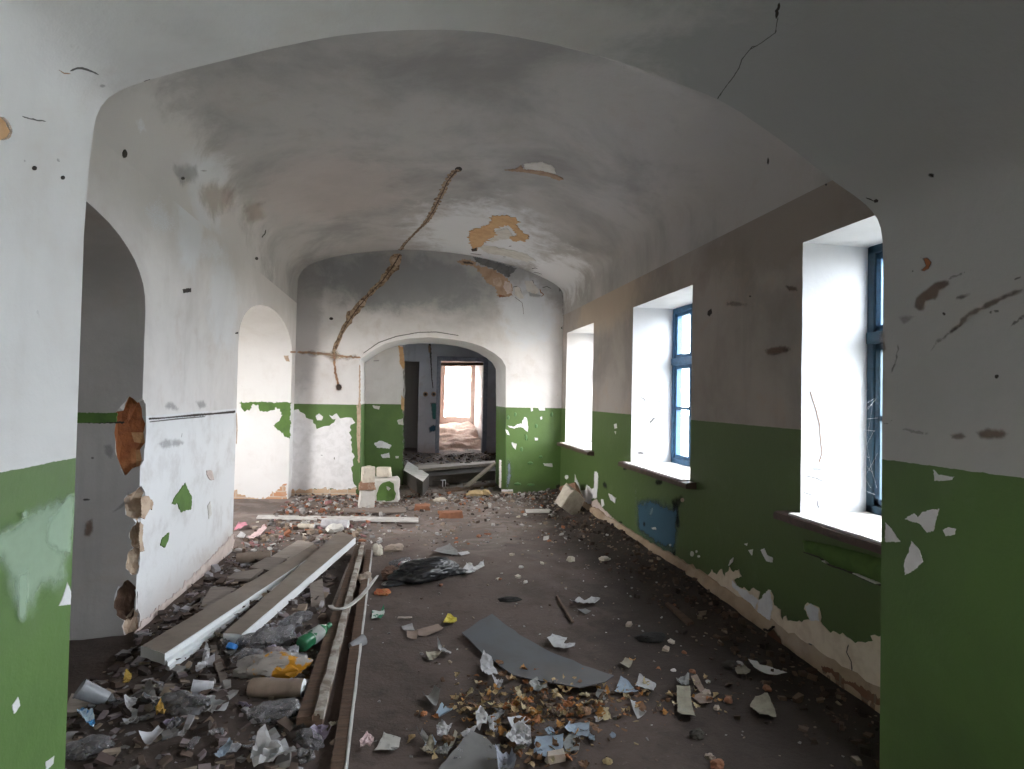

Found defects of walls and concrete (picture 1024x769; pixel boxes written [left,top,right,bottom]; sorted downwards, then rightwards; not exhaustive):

crack [717,3,780,99]
crack [290,169,461,388]
peeling [457,215,561,314]
damp [916,281,948,310]
damp [945,277,1020,337]
flaking render [114,397,145,475]
peeling [234,365,380,499]
peeling [505,407,545,450]
flaking render [114,487,234,634]
peeling [885,522,923,575]
peeling [906,509,956,536]
peeling [708,557,881,710]